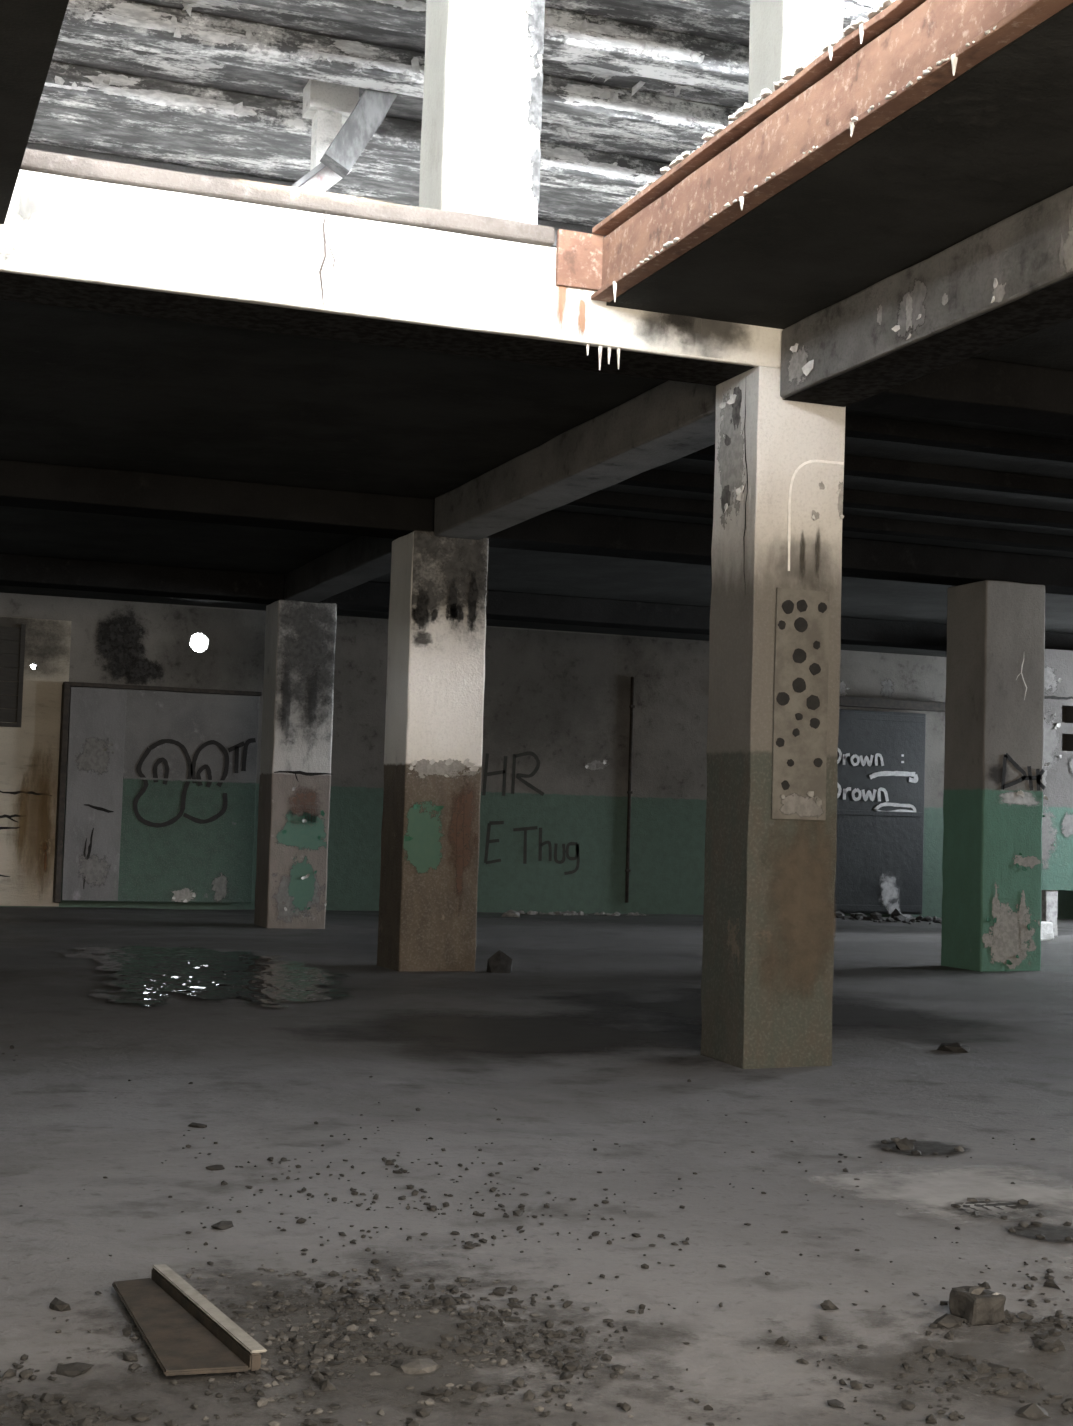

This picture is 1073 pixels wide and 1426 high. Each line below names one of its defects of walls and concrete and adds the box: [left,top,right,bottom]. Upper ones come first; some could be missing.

corrosion [542,257,586,334]
damp [415,573,478,631]
damp [281,672,290,725]
peeling [1044,666,1062,693]
peeling [1000,710,1073,871]
corrosion [448,783,478,909]
peeling [982,882,1040,972]